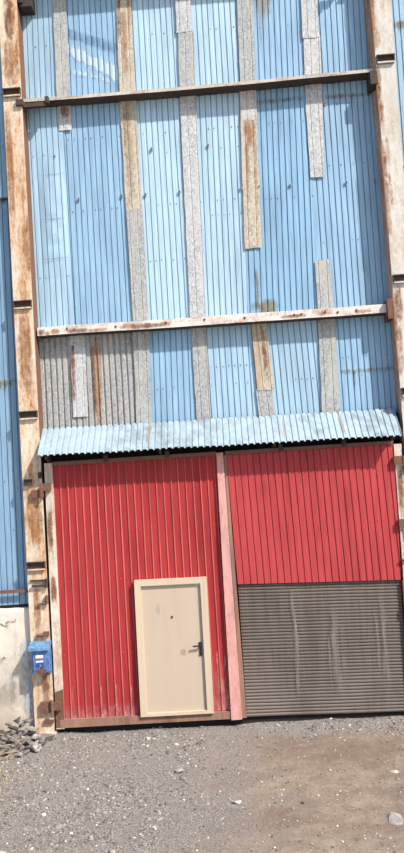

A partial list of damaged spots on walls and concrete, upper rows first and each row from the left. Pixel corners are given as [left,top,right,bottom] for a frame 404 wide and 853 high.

corrosion [4,0,18,76]
corrosion [6,120,24,208]
corrosion [244,123,257,171]
corrosion [381,141,391,231]
corrosion [387,288,403,372]
corrosion [92,344,101,416]